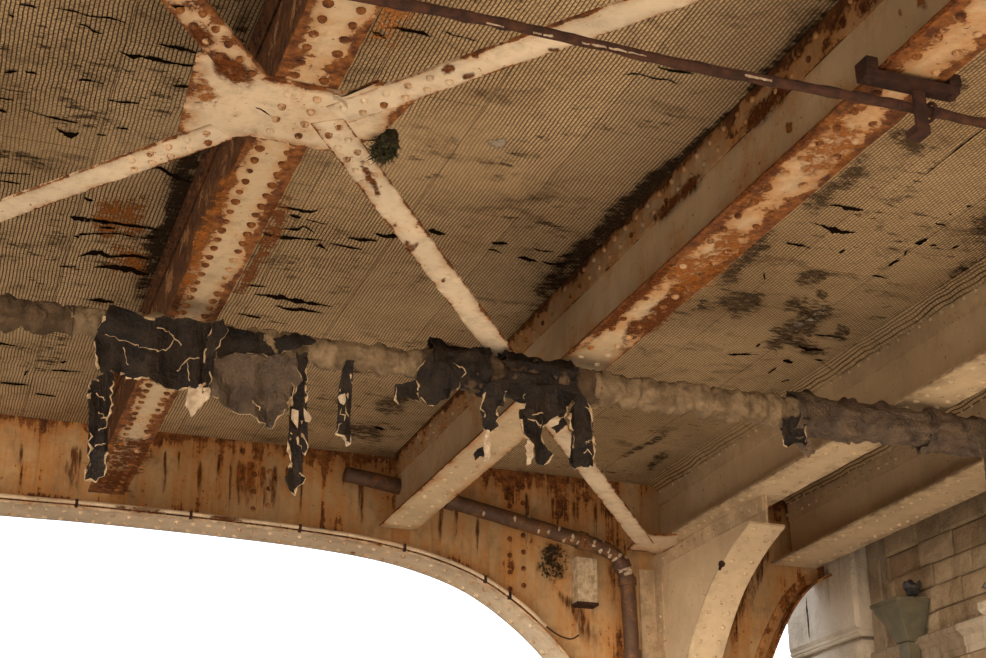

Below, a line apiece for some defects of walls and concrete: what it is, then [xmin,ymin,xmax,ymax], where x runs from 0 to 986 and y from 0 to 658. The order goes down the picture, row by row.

corrosion [189,21,215,48]
corrosion [195,55,254,103]
corrosion [745,76,788,130]
corrosion [360,161,380,195]
corrosion [653,174,702,224]
damp [531,0,838,319]
corrosion [735,118,863,202]
corrosion [585,229,745,347]
damp [766,270,850,356]
corrosion [99,437,166,494]
damp [538,544,567,580]
corrosion [731,552,769,630]